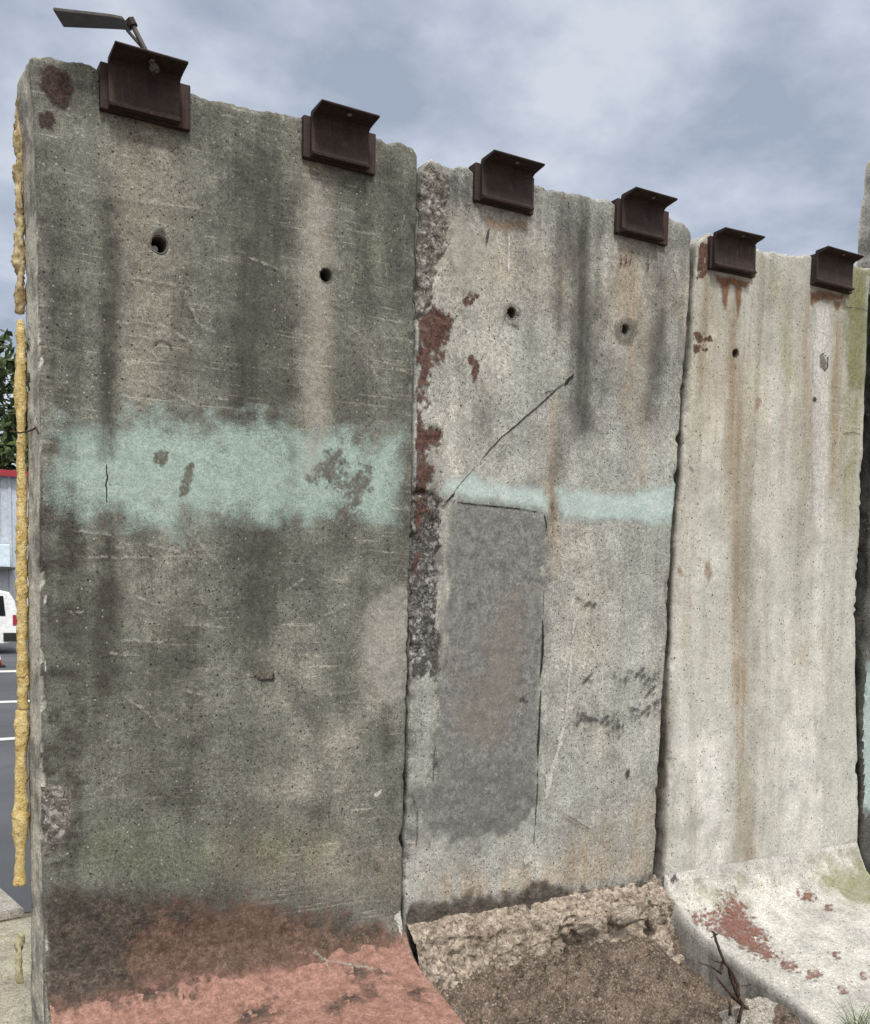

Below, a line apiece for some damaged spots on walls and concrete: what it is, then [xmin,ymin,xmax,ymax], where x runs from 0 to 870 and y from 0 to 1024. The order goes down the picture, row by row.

corrosion [38,65,74,129]
spalling [413,166,451,327]
corrosion [696,242,749,312]
corrosion [811,291,843,309]
corrosion [693,331,713,353]
peeling [307,438,373,515]
corrosion [411,290,479,580]
crack [443,374,574,506]
spalling [408,490,442,661]
leakage [411,627,444,682]
crack [534,601,596,839]
corrosion [797,888,833,911]